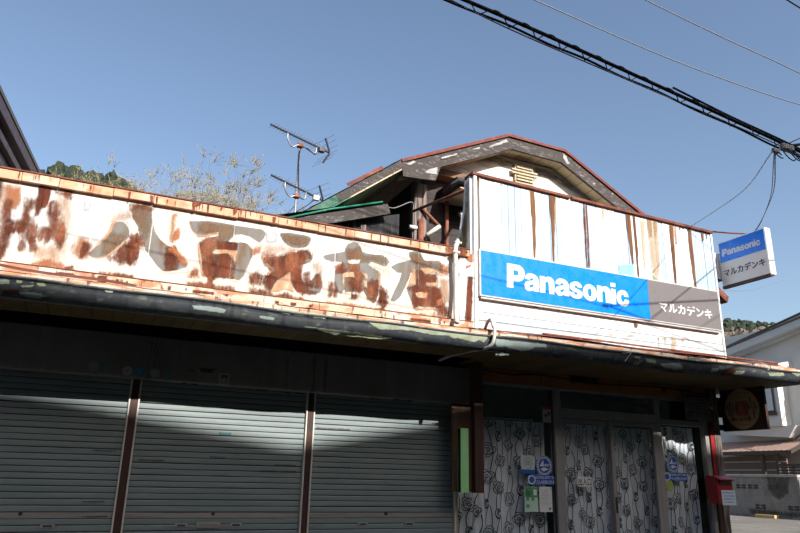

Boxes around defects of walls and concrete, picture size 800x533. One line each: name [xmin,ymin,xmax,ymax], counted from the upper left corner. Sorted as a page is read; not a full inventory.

peeling [0,279,47,299]
corrosion [0,174,75,275]
corrosion [76,239,90,258]
corrosion [98,233,144,283]
corrosion [128,191,238,296]
peeling [193,305,226,313]
corrosion [249,248,390,311]
corrosion [408,265,450,323]
corrosion [549,194,557,262]
corrosion [626,214,660,277]
corrosion [669,225,707,287]